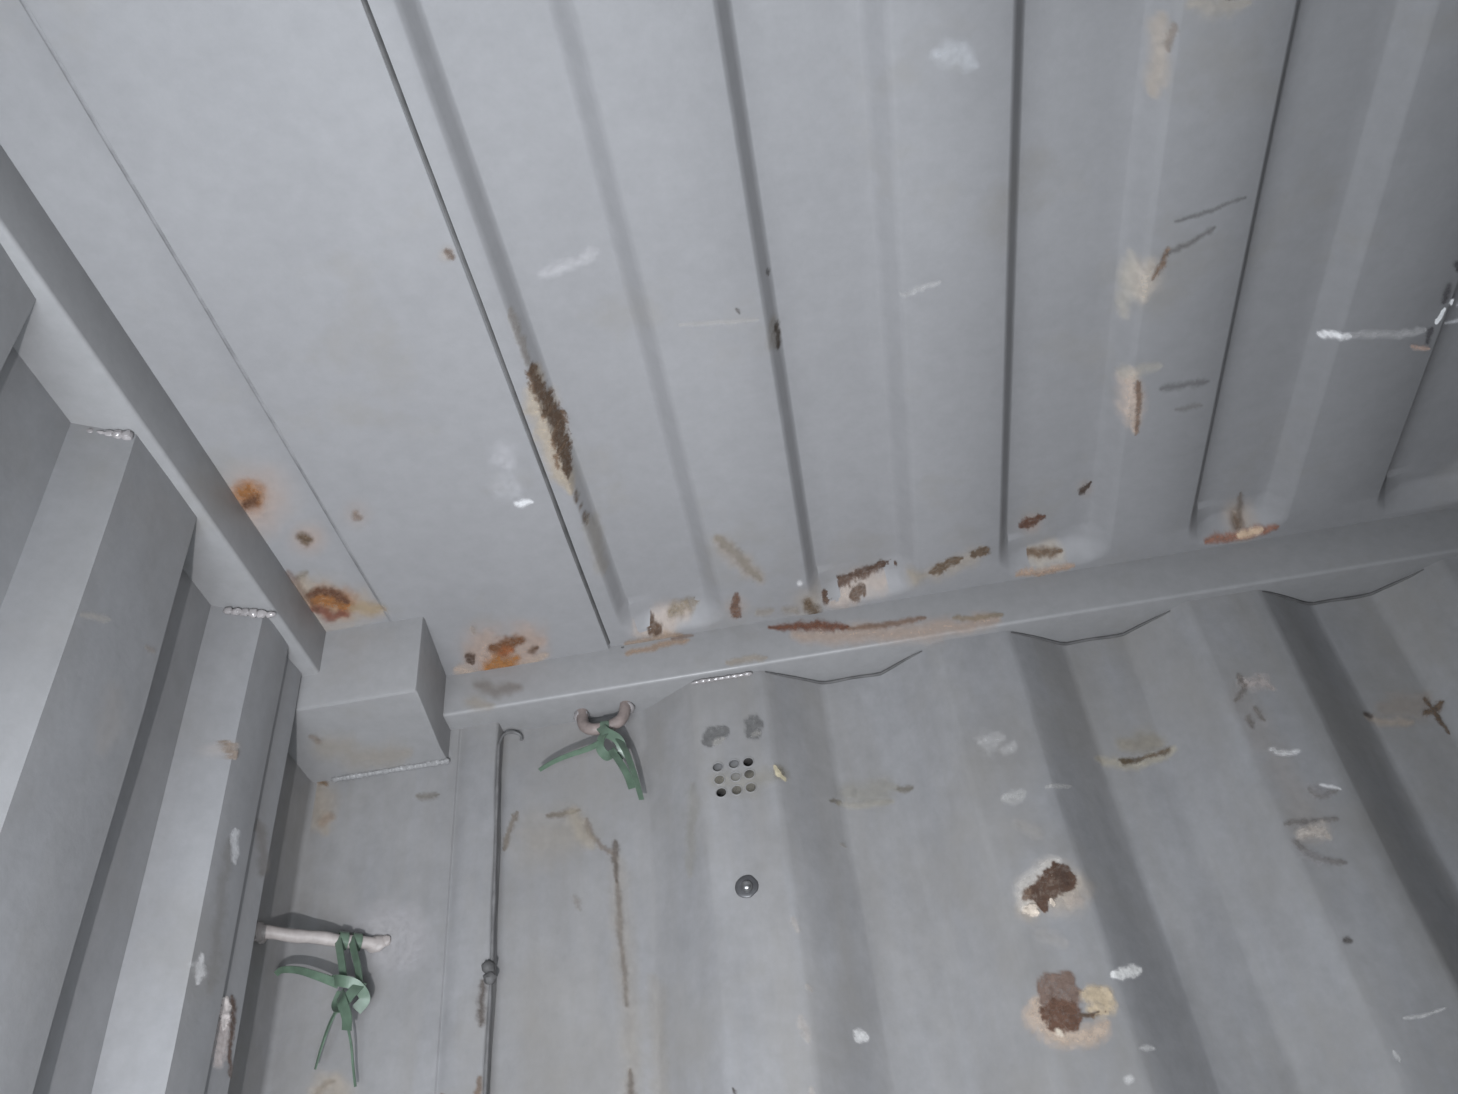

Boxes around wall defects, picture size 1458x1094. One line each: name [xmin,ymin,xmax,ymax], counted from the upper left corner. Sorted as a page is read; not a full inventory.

rust [235,483,261,508]
rust [1205,493,1279,544]
rust [306,588,351,620]
rust [768,599,926,631]
rust [465,636,538,670]